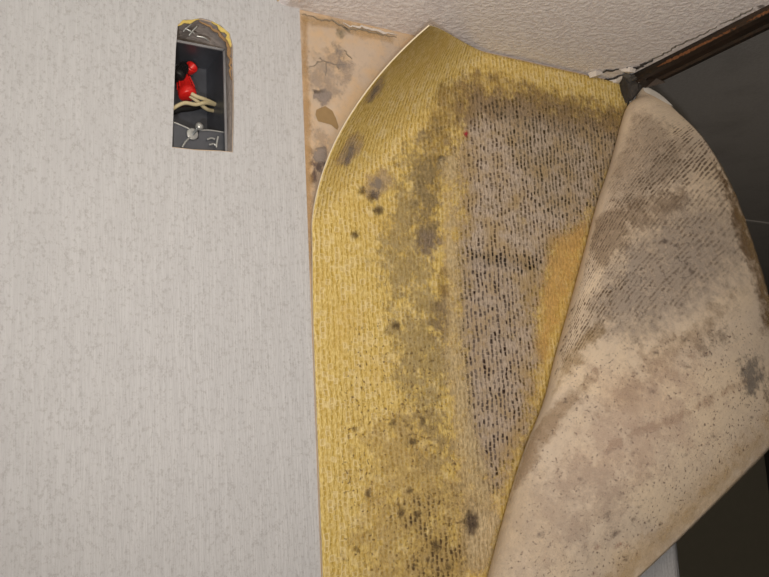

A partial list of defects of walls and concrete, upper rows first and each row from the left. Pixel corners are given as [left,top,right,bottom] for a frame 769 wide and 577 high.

spalling [588,59,653,103]
spalling [314,90,339,129]
leakage [310,147,327,182]
leakage [344,89,769,577]